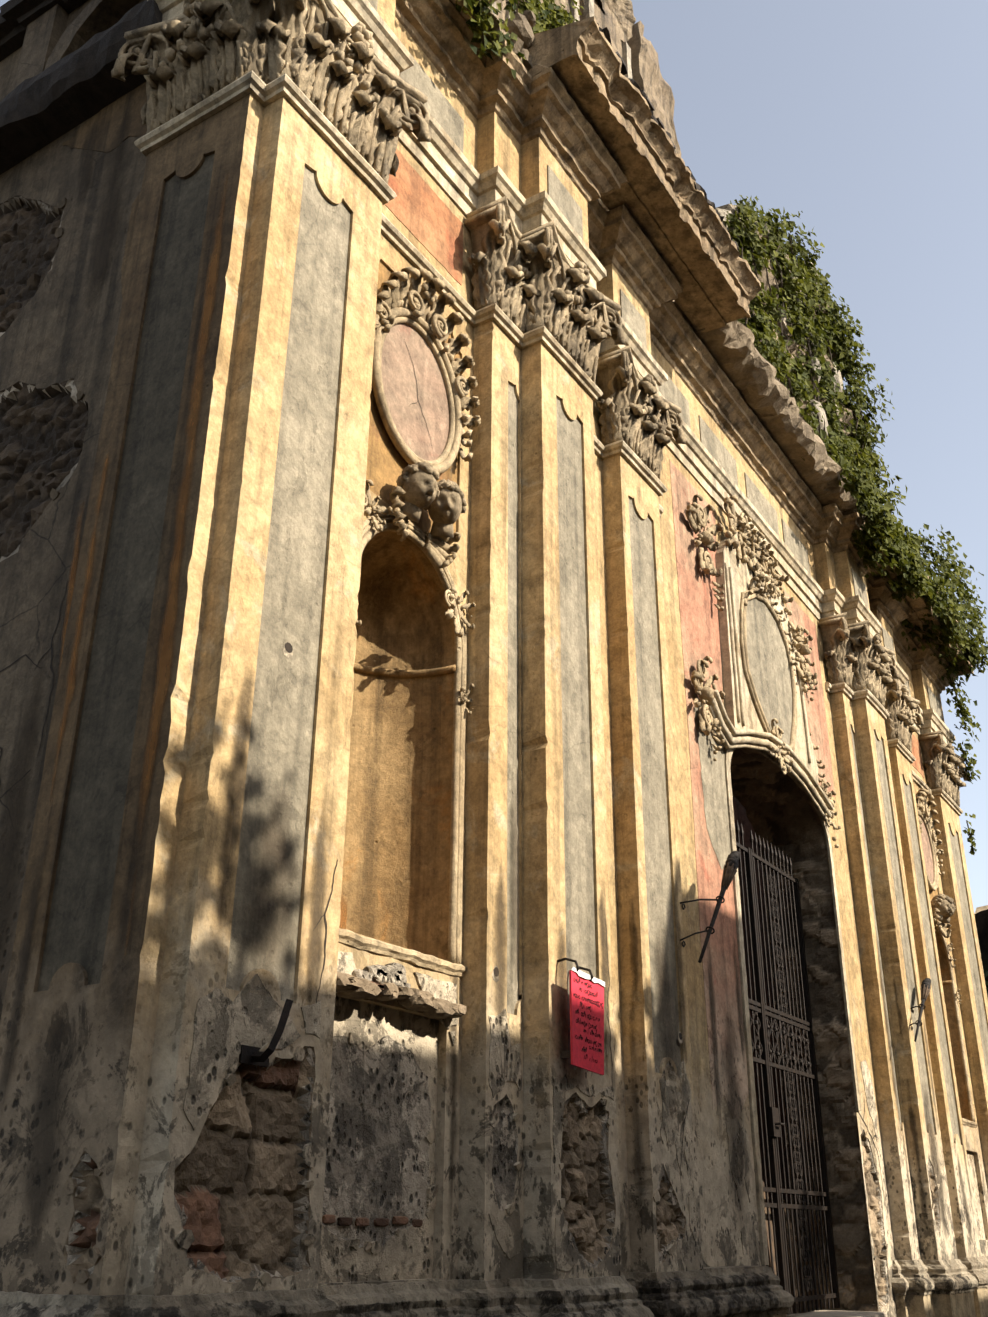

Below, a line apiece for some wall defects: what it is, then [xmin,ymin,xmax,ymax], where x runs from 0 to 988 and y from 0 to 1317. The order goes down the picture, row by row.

flaking render [0,195,67,337]
flaking render [0,378,88,562]
crack [0,581,68,817]
water stain [6,909,35,1078]
water stain [600,900,609,1039]
flaking render [174,974,438,1284]
flaking render [552,1076,617,1276]